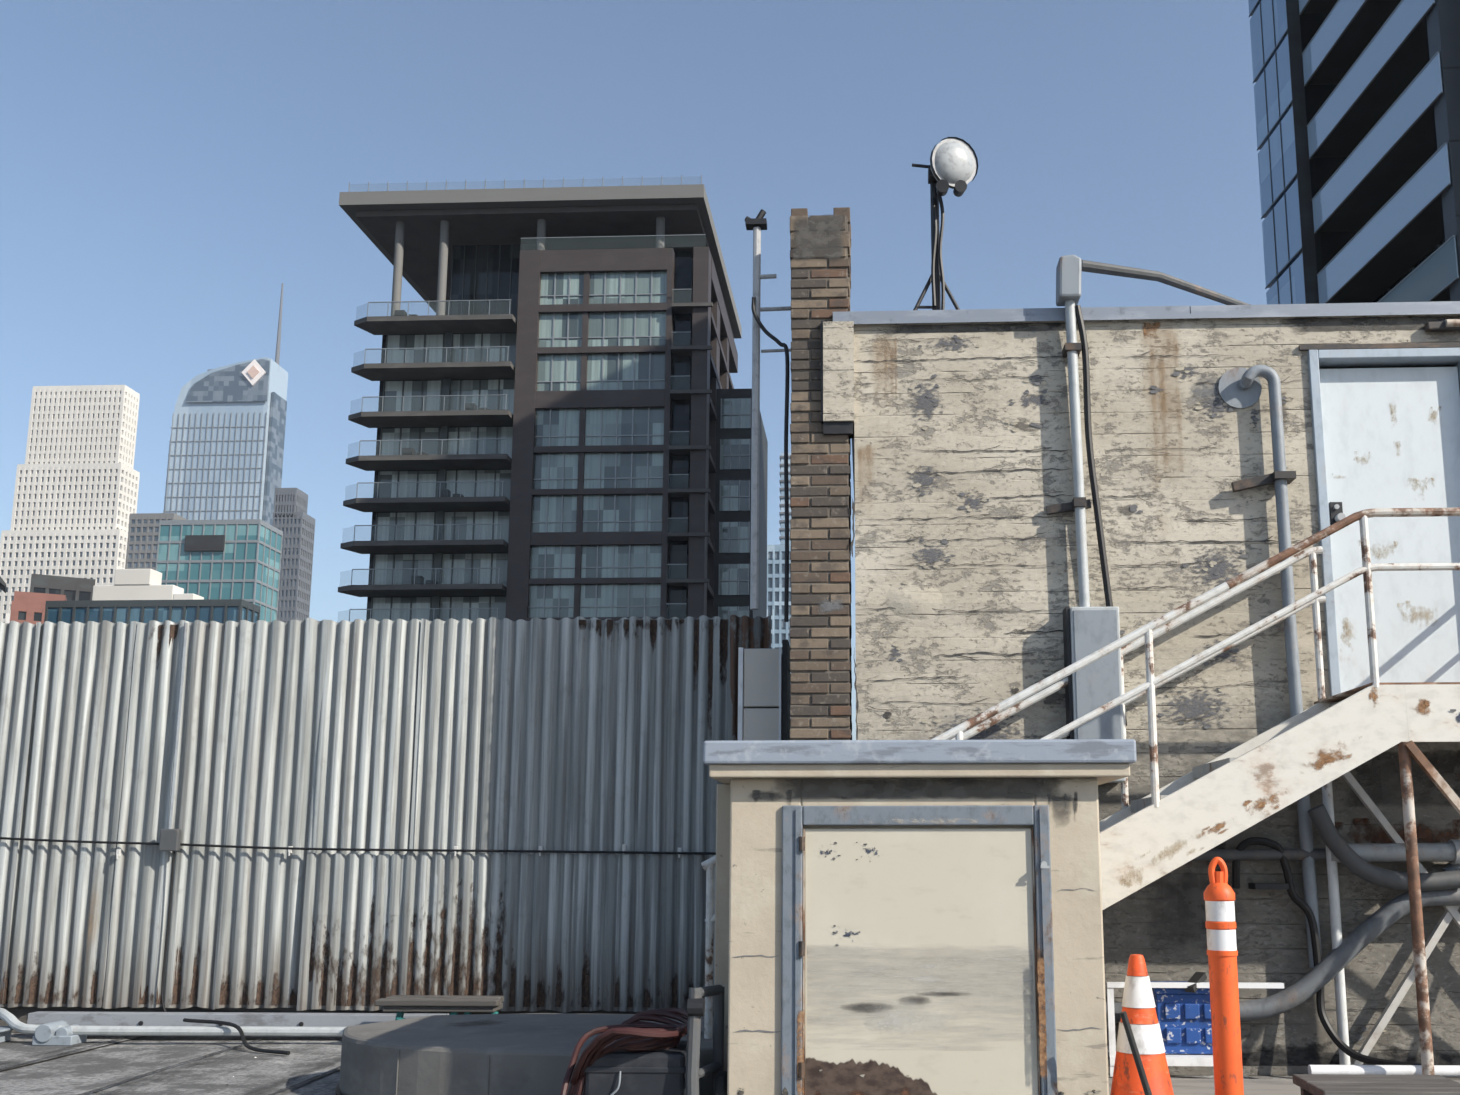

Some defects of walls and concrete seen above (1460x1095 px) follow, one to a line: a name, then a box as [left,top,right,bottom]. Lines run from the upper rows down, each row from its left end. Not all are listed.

peeling [1005,376,1052,432]
peeling [1195,393,1260,428]
peeling [1281,392,1290,428]
peeling [1117,503,1143,519]
peeling [1182,545,1249,588]
corrosion [579,619,728,729]
peeling [1192,639,1239,666]
peeling [1158,687,1240,733]
corrosion [1416,699,1429,715]
corrosion [219,884,693,1008]
corrosion [0,958,99,1004]
corrosion [128,946,200,1005]